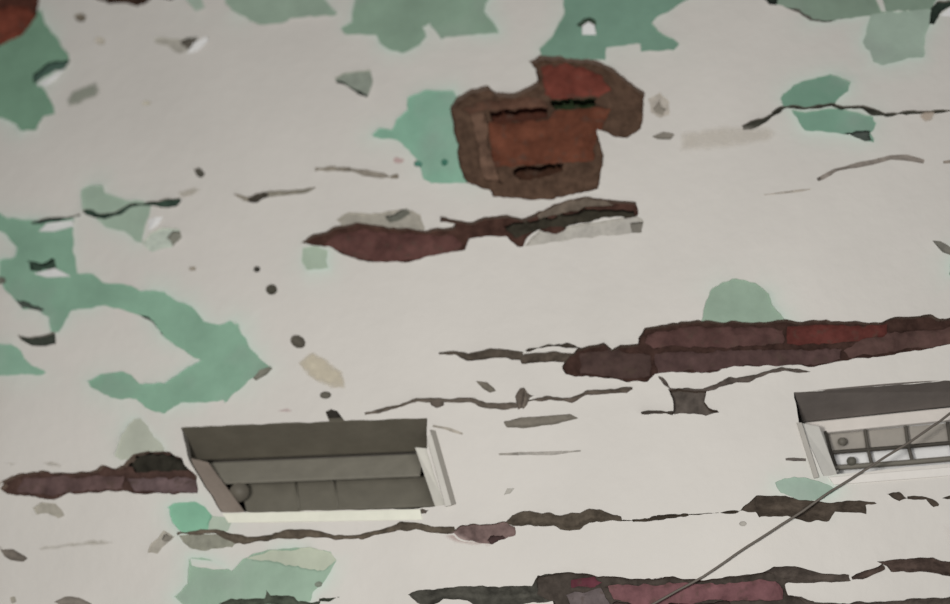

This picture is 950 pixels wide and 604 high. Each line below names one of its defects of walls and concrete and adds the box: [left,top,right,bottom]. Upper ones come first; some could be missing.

peeling [0,0,70,131]
flaking render [301,0,686,270]
crack [742,102,950,130]
peeling [0,214,273,414]
crack [439,343,582,364]
flaking render [562,278,950,382]
crack [365,387,633,435]
crack [641,367,810,415]
peeling [0,418,336,604]
crack [177,521,455,545]
crack [506,492,950,531]
flaking render [536,572,805,604]